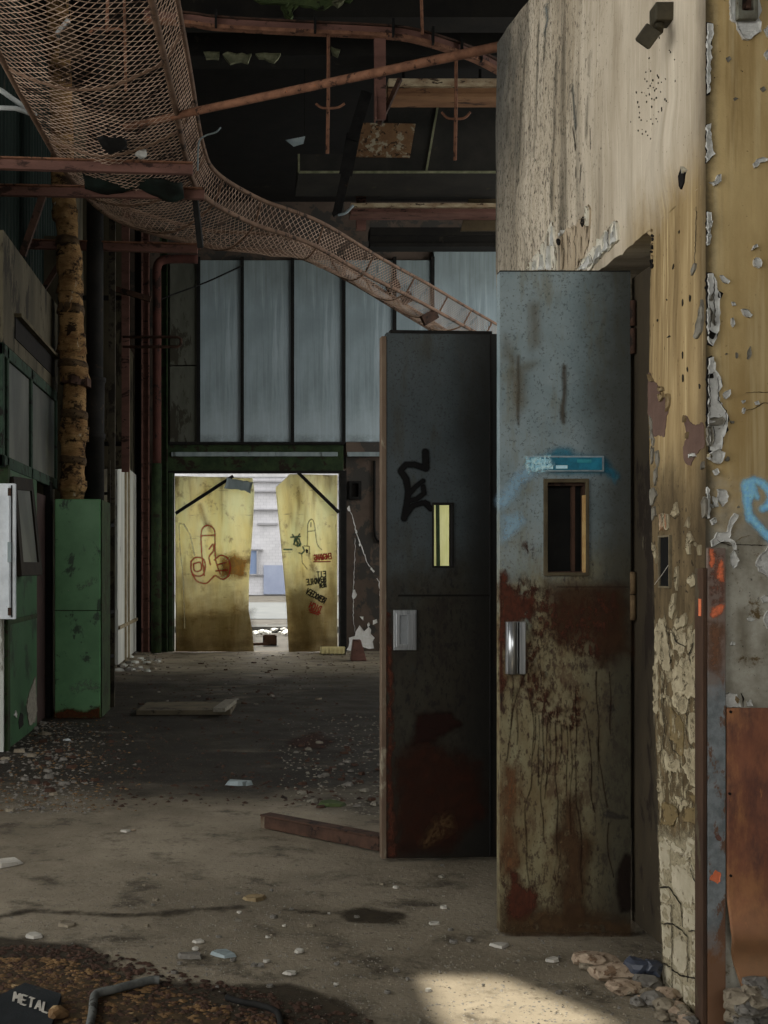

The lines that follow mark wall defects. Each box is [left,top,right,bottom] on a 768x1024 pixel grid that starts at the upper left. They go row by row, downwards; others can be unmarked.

peeling [729,0,768,41]
spalling [705,22,714,96]
spalling [705,124,715,164]
spalling [526,204,620,270]
spalling [705,211,713,246]
spalling [682,272,760,475]
peeling [647,372,671,521]
peeling [670,486,740,568]
peeling [347,616,380,651]
peeling [726,692,753,707]
corrosion [497,570,633,937]
corrosion [726,708,768,986]